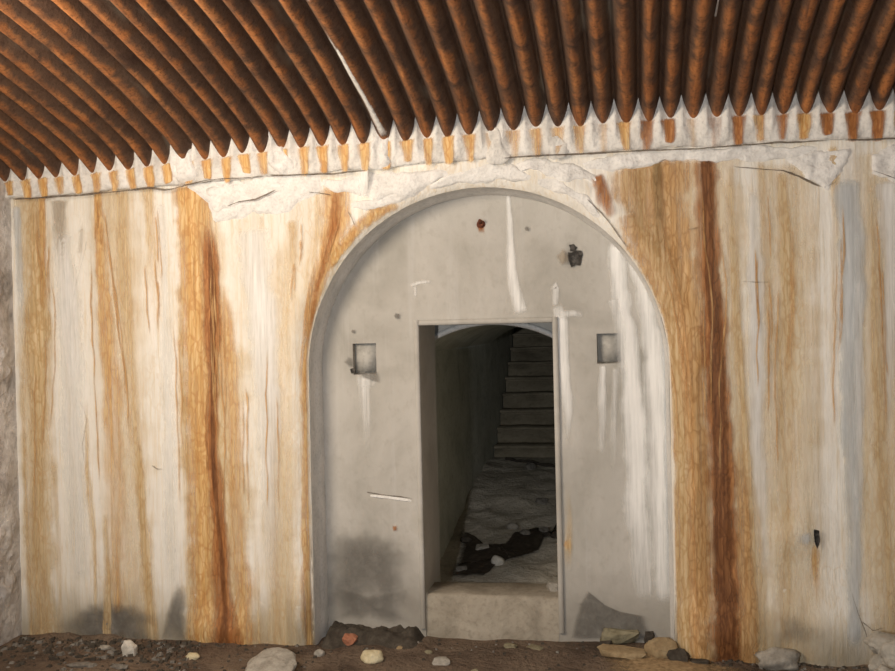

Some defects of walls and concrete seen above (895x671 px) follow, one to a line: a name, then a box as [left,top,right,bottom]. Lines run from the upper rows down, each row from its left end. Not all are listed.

rust [641,119,675,150]
rust [798,113,834,139]
rust [845,110,885,141]
crack [847,135,895,143]
crack [507,140,836,186]
water stain [170,43,865,640]
rust [5,175,82,635]
rust [90,163,259,645]
rust [301,190,392,645]
rust [594,160,758,663]
water stain [75,608,145,639]
water stain [166,595,182,631]